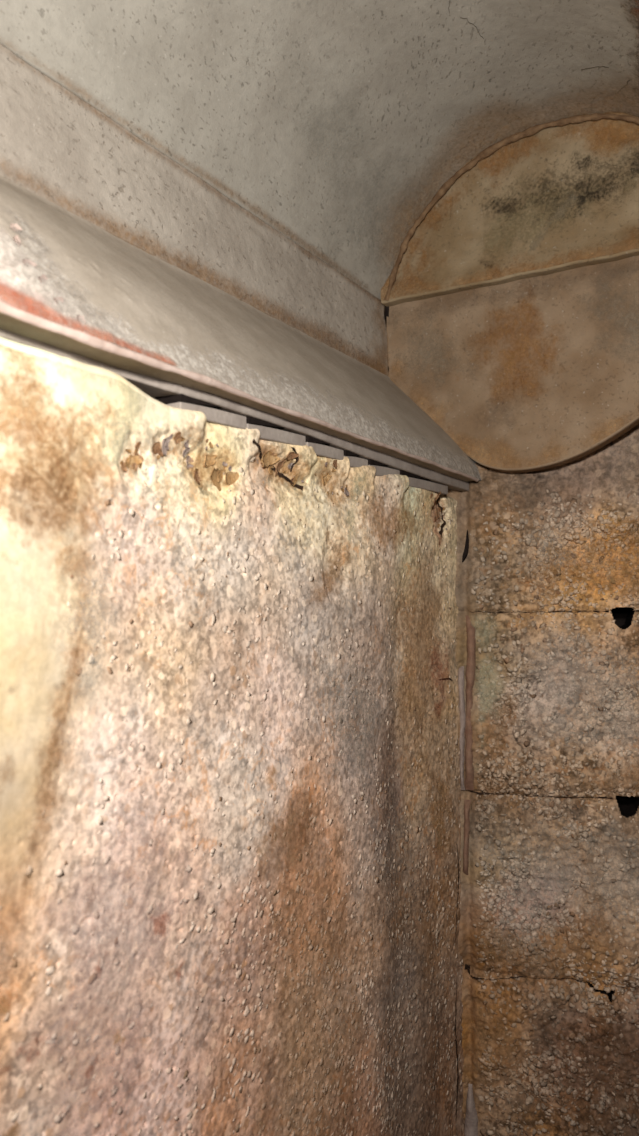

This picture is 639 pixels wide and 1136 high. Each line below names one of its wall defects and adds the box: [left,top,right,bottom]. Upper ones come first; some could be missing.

rust [0,285,175,366]
rust [0,358,92,571]
spalling [120,427,240,491]
peeling [253,439,349,501]
rust [417,397,560,468]
crack [455,843,589,1118]